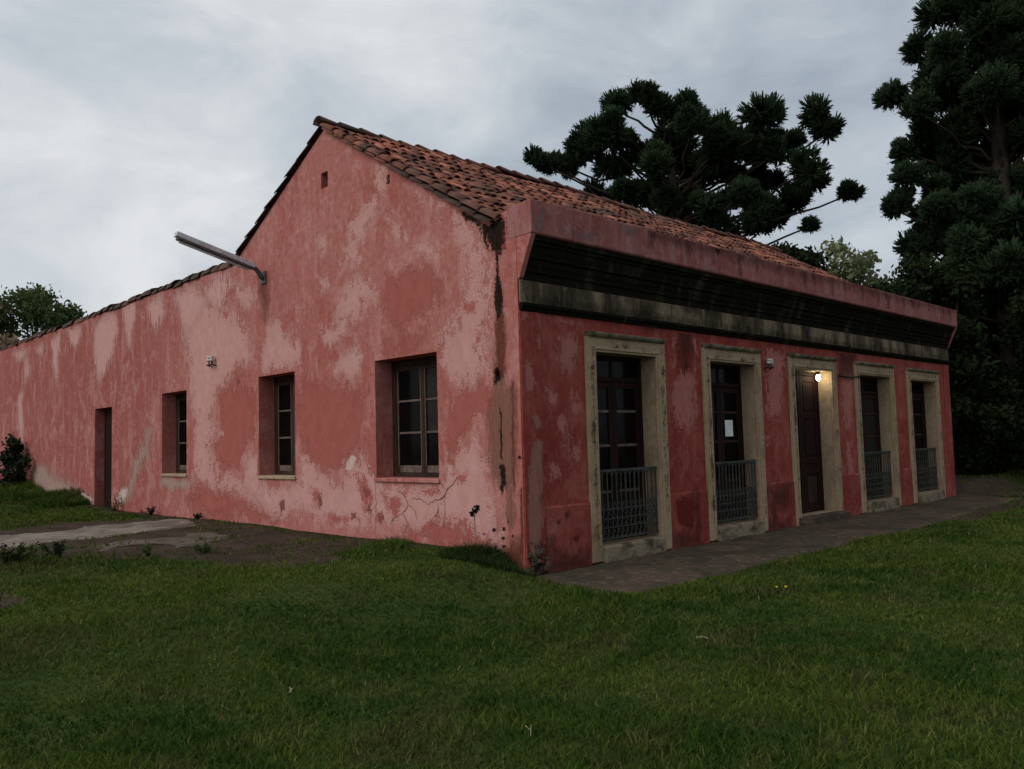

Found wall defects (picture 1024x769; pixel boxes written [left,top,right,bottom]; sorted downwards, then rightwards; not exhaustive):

damp [461,211,507,257]
peeling [312,163,509,394]
spalling [30,457,94,505]
spalling [116,423,154,507]
peeling [159,280,600,576]
crack [370,472,458,536]